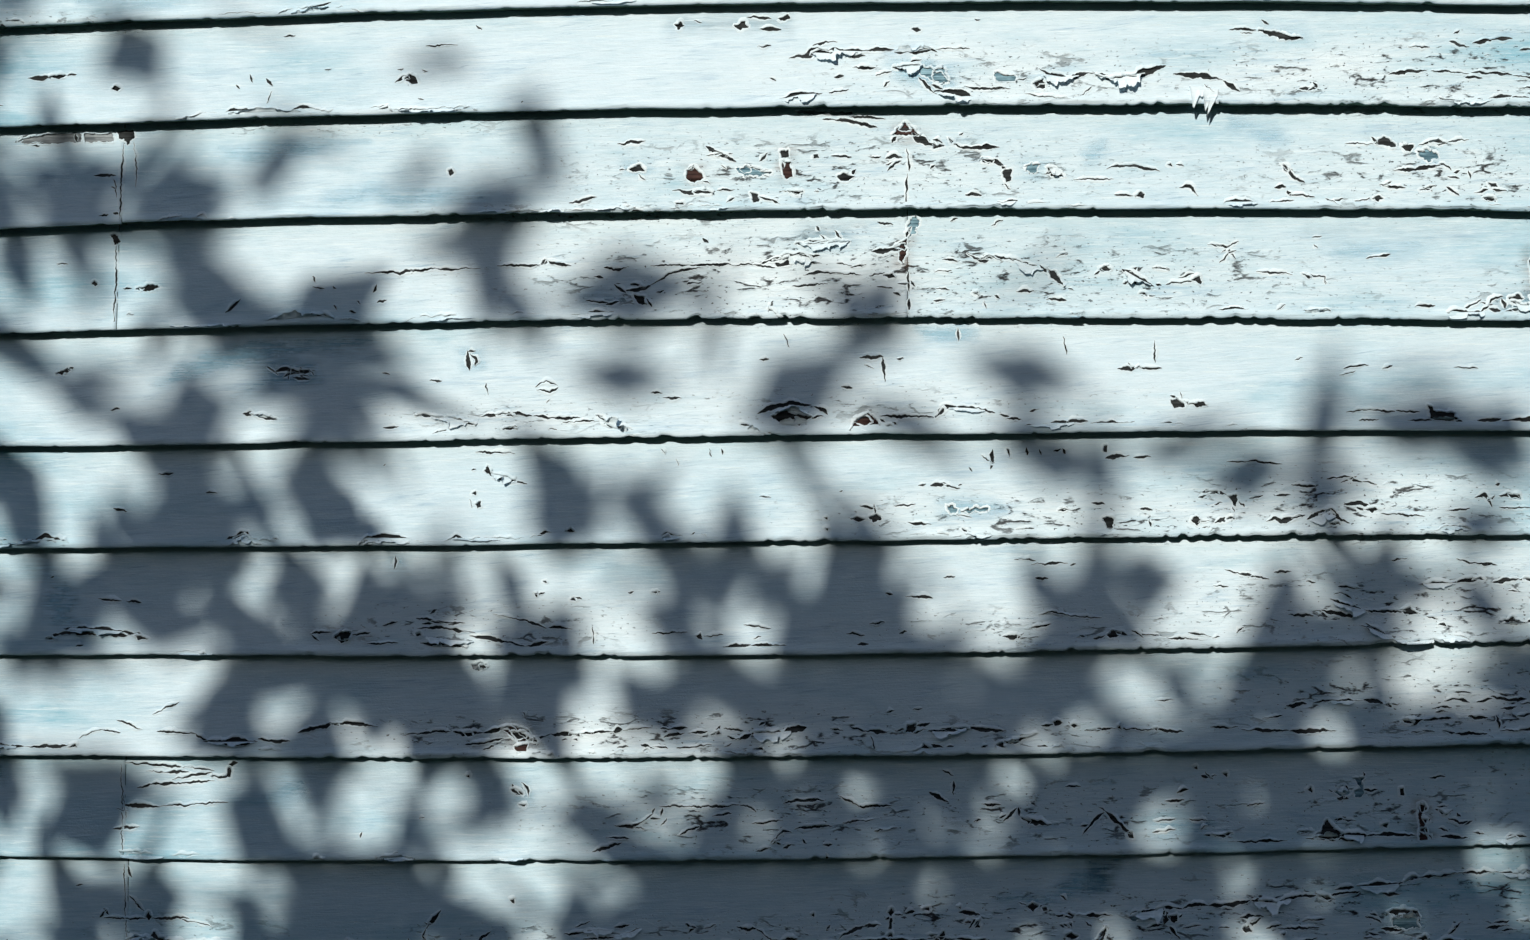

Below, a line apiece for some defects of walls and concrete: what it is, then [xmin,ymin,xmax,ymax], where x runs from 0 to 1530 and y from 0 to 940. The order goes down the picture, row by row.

spalling [732,13,792,51]
spalling [1229,19,1304,42]
peeling [475,152,819,213]
spalling [810,148,914,184]
spalling [980,156,1067,205]
spalling [1345,134,1469,164]
peeling [571,226,916,318]
spalling [738,397,829,435]
spalling [849,482,992,539]
peeling [1188,487,1350,531]
peeling [309,608,572,672]
peeling [1018,864,1530,940]